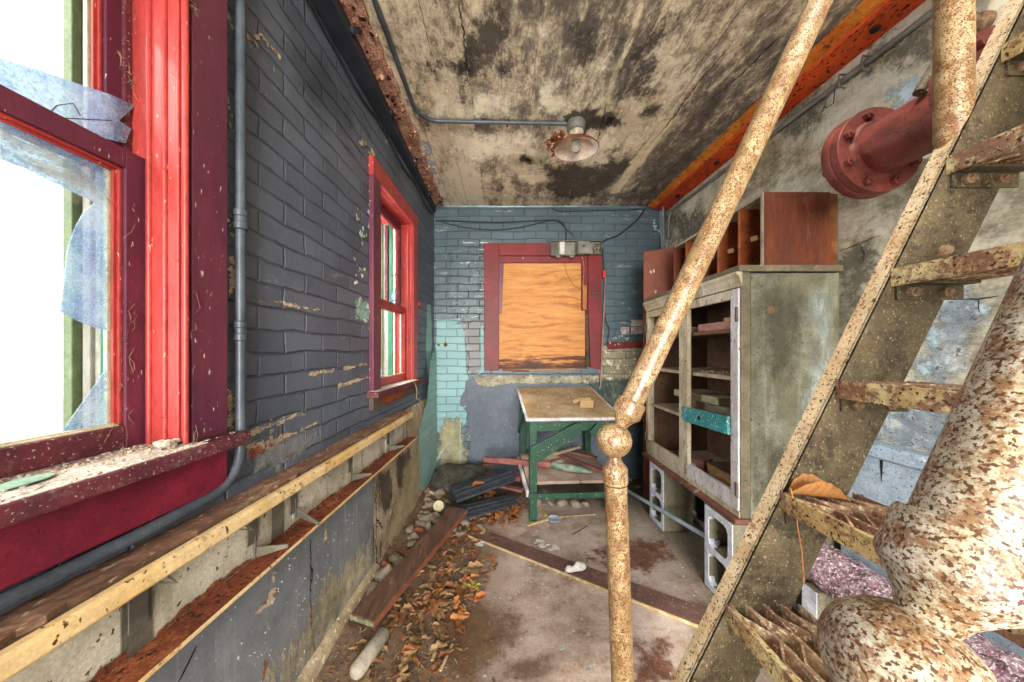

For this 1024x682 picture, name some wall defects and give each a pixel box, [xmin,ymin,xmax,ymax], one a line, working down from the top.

peeling [227,11,281,74]
damp [865,25,932,77]
damp [426,0,699,201]
damp [777,85,831,140]
peeling [356,297,370,330]
peeling [308,363,369,389]
peeling [418,242,600,491]
peeling [246,413,317,460]
damp [377,448,421,557]